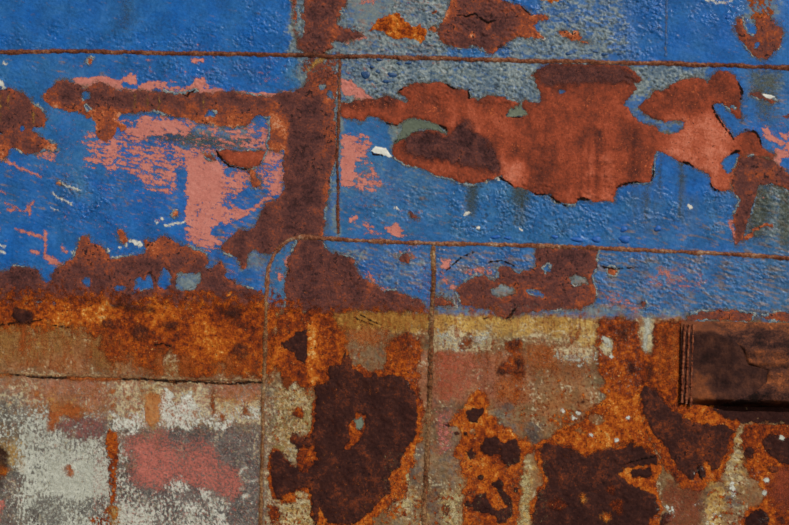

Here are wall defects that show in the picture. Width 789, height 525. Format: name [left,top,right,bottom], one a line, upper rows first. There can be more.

rust [732,0,785,61]
peeling [73,73,224,94]
peeling [340,63,789,207]
peeling [77,115,285,252]
rust [0,0,600,525]
peeling [349,215,417,259]
peeling [440,259,457,290]
peeling [554,336,612,367]
rust [431,308,789,525]